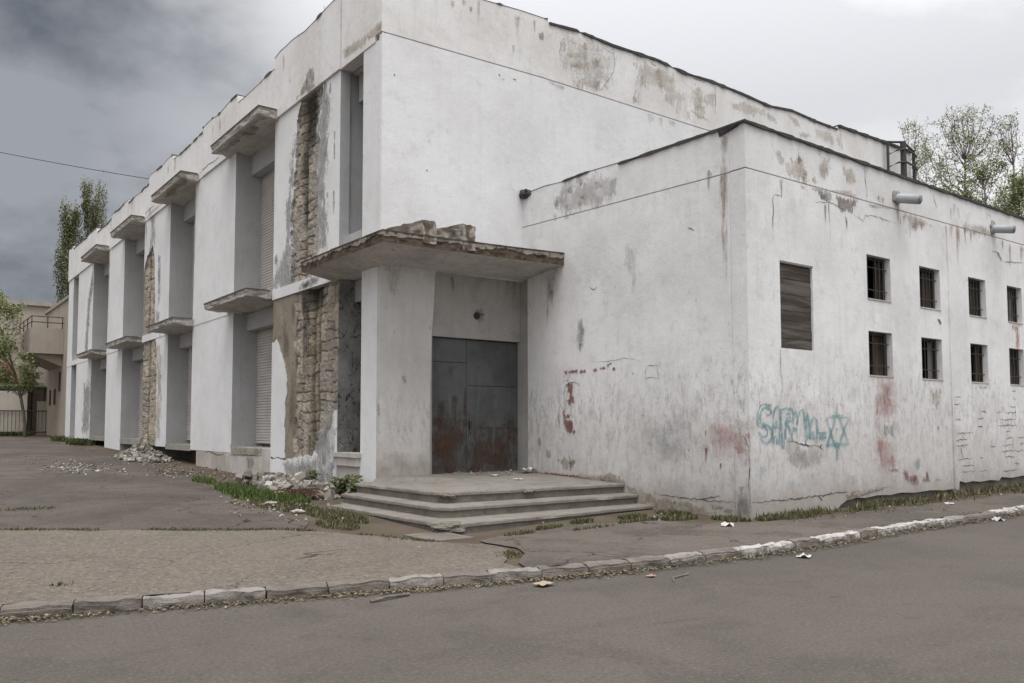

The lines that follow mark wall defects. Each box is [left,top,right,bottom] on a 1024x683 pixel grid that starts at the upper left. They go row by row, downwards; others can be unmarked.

flaking render [141,179,187,445]
flaking render [268,67,565,482]
corrosion [432,417,517,473]
crack [656,436,860,503]